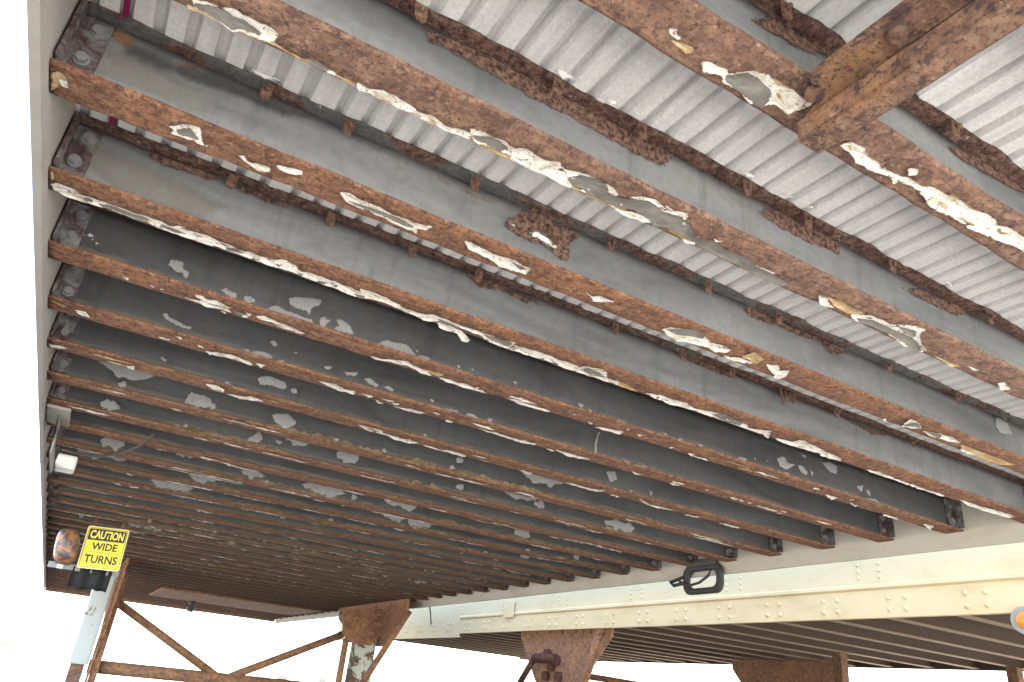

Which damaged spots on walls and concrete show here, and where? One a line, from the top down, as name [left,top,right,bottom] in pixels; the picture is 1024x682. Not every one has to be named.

corrosion [426,30,671,165]
peeling [701,61,812,114]
peeling [187,0,791,286]
corrosion [504,210,579,261]
corrosion [761,207,840,254]
peeling [840,142,1024,251]
corrosion [949,146,1024,192]
peeling [50,171,880,507]
corrosion [743,306,847,356]
peeling [818,295,979,371]
corrosion [908,288,969,316]
peeling [57,381,676,595]